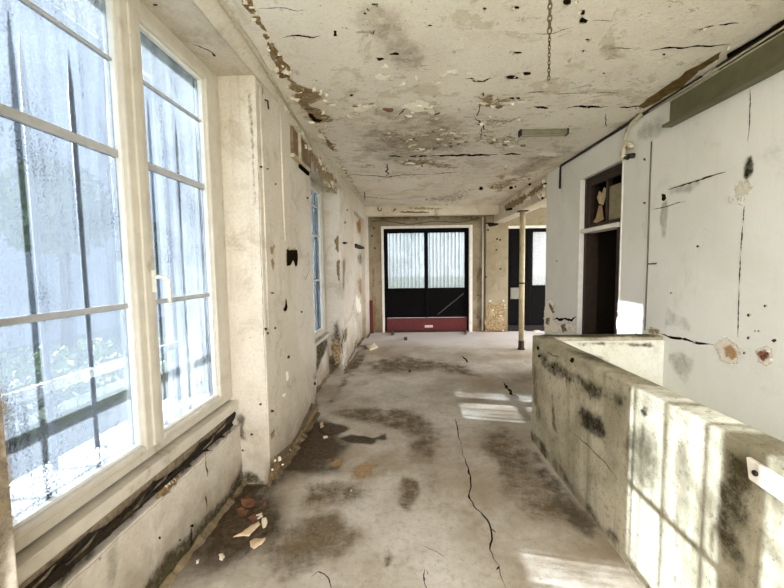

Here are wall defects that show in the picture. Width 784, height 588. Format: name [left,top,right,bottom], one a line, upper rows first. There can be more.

flaking render [242,0,528,196]
crack [350,106,522,199]
damp [315,325,472,386]
flaking render [484,300,506,331]
damp [542,334,655,365]
crack [655,330,713,346]
crack [736,210,744,328]
flaking render [754,346,774,366]
peeling [156,474,181,499]
damp [145,391,436,588]
crack [441,412,505,585]
damp [718,453,750,558]